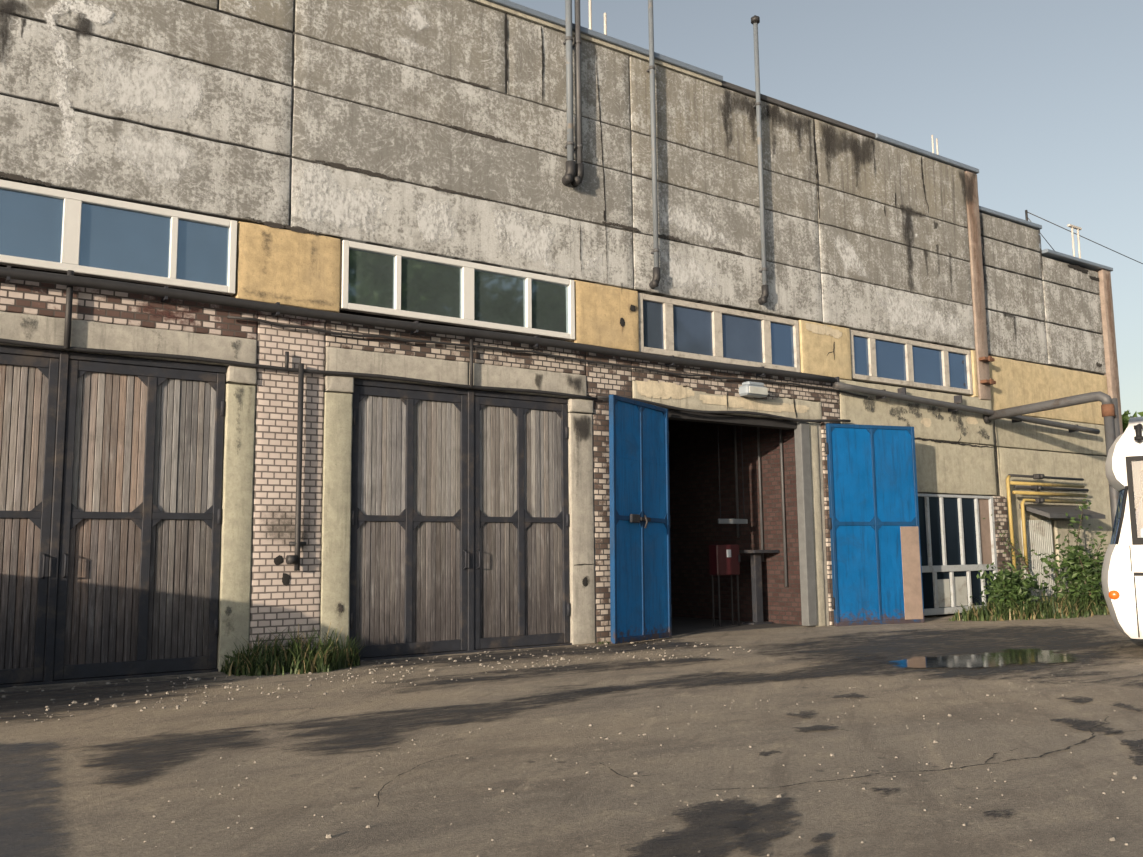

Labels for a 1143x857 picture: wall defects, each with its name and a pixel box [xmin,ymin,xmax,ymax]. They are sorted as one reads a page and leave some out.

damp [0,0,26,58]
damp [75,14,92,38]
damp [721,91,876,186]
damp [900,206,952,289]